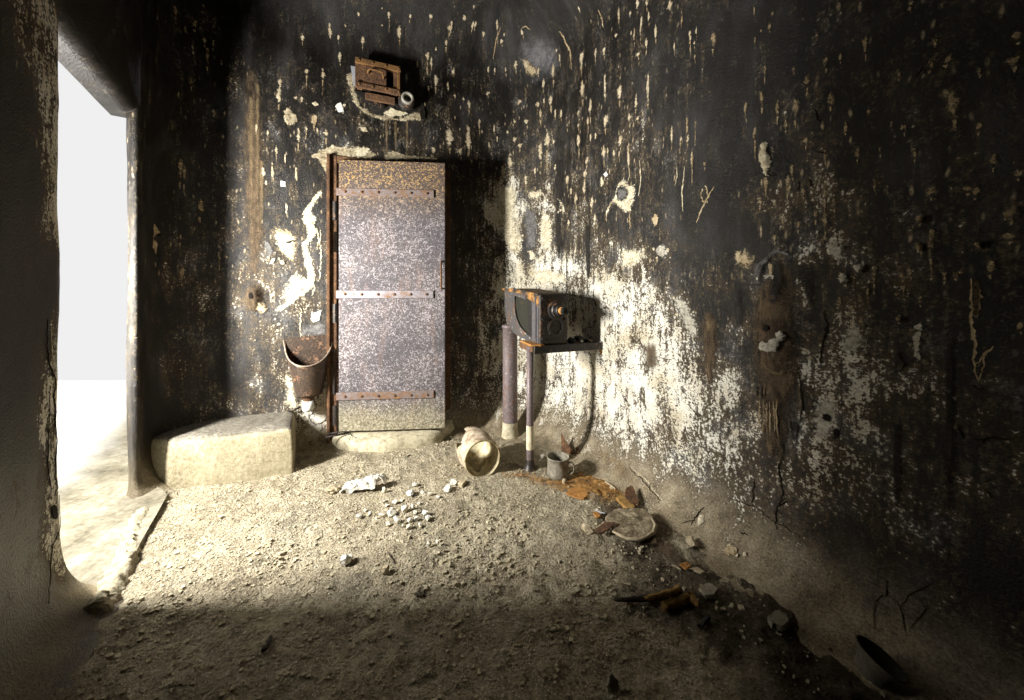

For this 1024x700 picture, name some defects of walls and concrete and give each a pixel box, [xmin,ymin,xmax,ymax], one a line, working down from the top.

water stain [615,0,657,60]
water stain [604,75,649,120]
water stain [760,65,809,133]
water stain [671,118,706,210]
peeling [265,190,322,337]
peeling [497,184,566,285]
spalling [606,180,636,227]
peeling [619,245,670,268]
peeling [672,296,697,341]
crack [729,311,829,537]
crack [46,319,61,604]
crack [868,581,934,629]